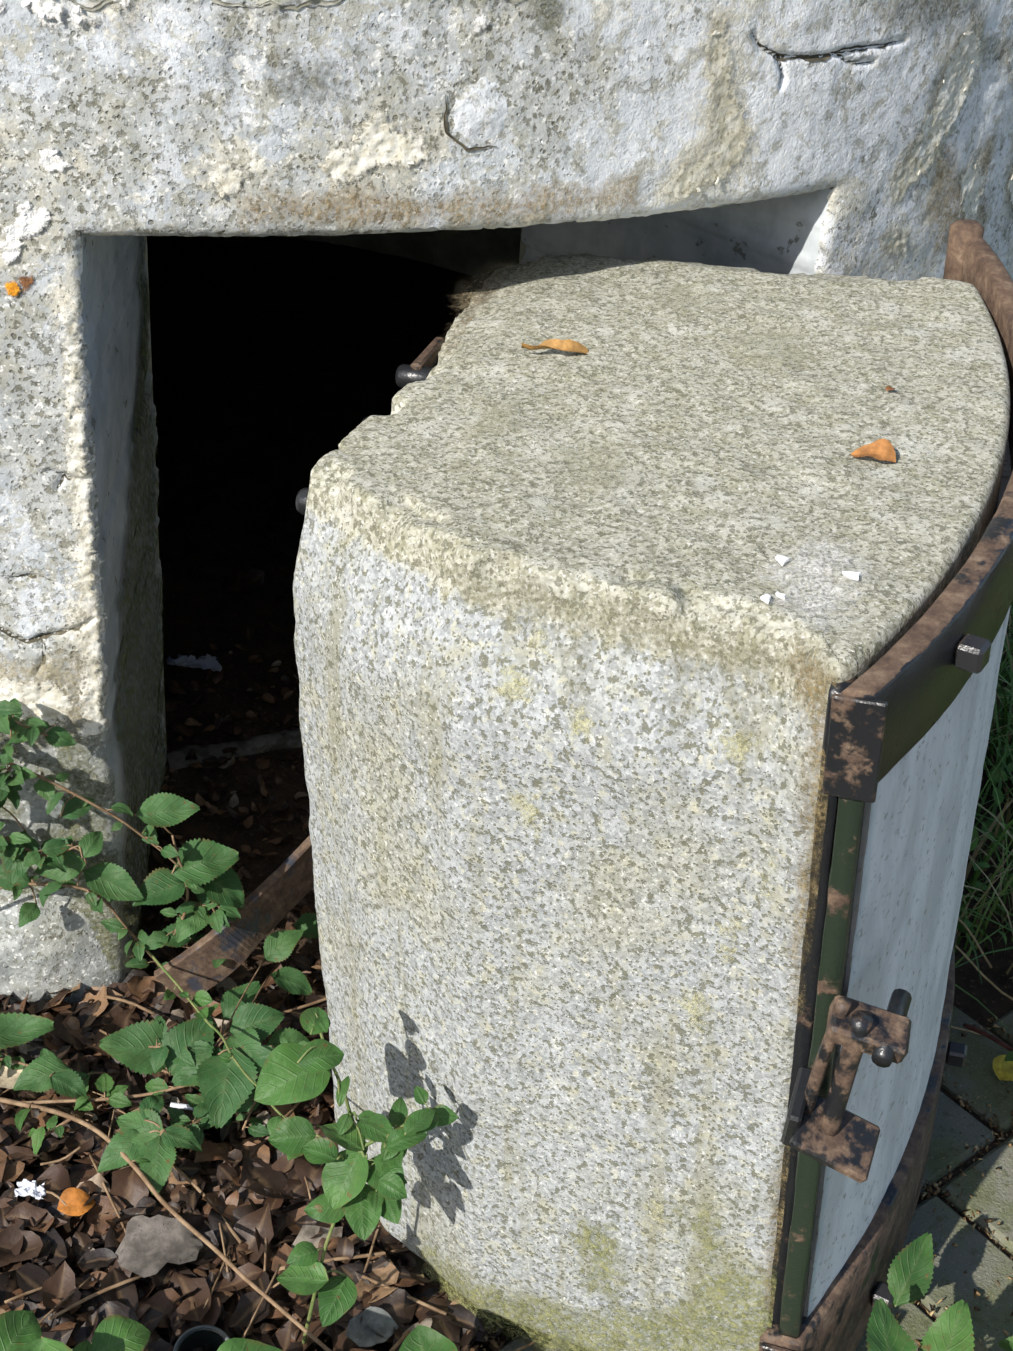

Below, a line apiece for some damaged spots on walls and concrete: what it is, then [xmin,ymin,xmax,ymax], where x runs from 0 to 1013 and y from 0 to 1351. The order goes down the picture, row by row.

crack [752,32,902,85]
crack [0,623,84,671]
rust [795,650,831,844]